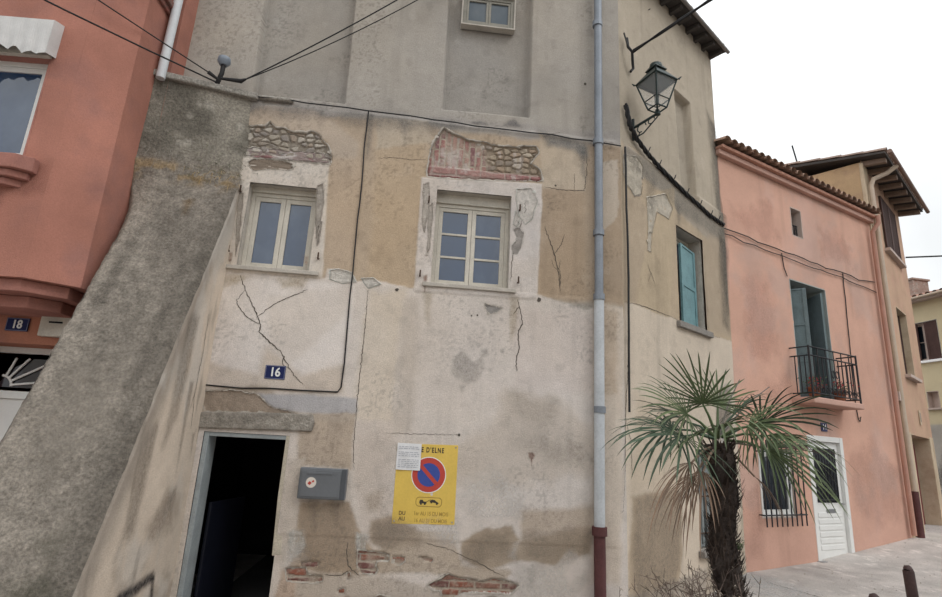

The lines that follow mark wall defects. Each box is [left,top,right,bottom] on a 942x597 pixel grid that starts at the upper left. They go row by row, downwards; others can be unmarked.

spalling [246,121,332,165]
flaking render [421,126,544,255]
crack [236,275,308,384]
flaking render [285,562,324,584]
flaking render [337,549,406,595]
flaking render [426,573,520,597]